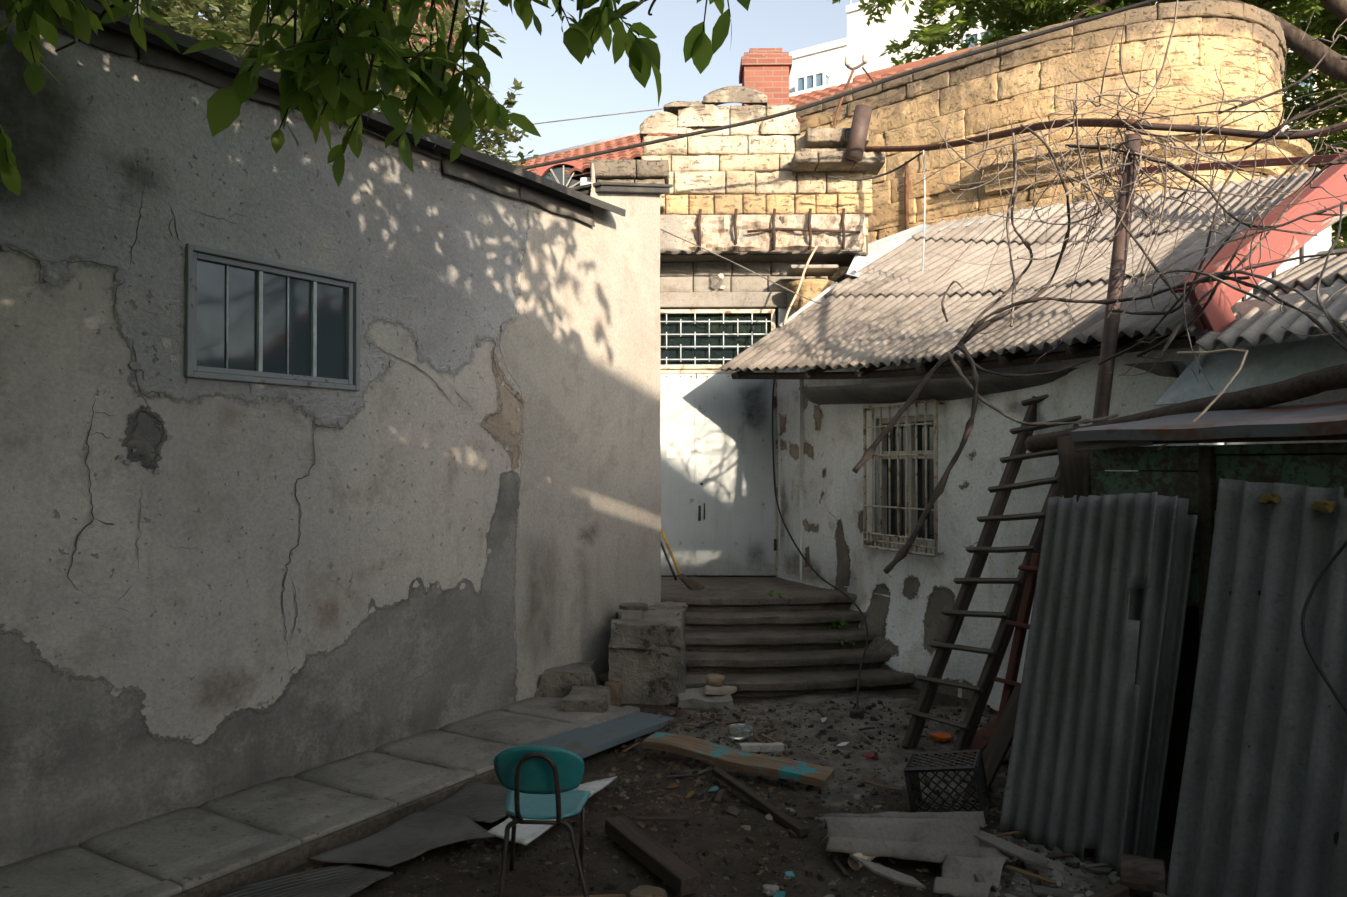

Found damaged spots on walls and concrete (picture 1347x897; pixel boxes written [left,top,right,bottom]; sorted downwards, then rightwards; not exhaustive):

crack [0,189,250,407]
crack [67,394,200,612]
peeling [0,28,529,867]
crack [281,402,352,667]
flaking render [803,519,819,567]
flaking render [834,510,863,592]
flaking render [860,575,974,700]